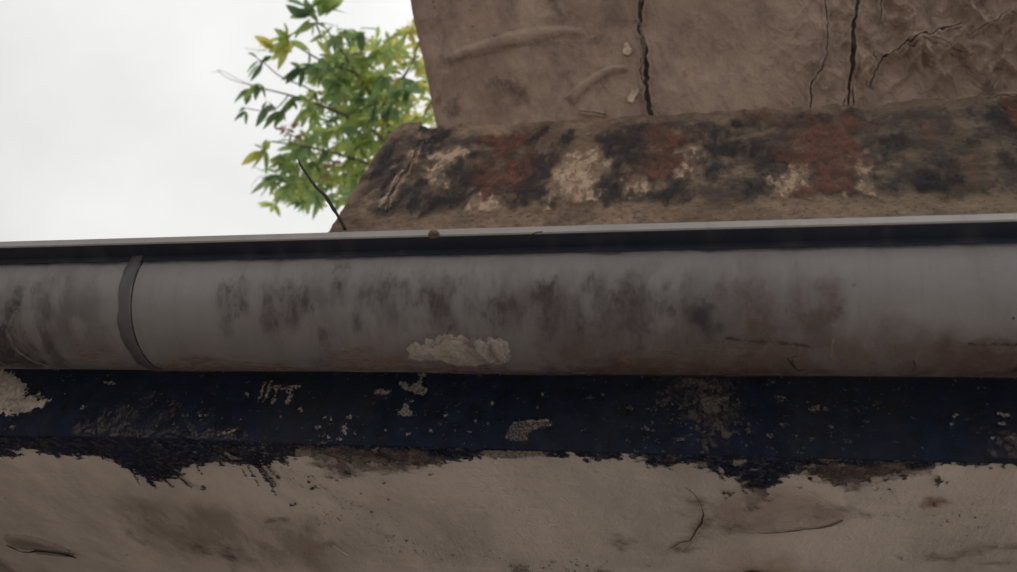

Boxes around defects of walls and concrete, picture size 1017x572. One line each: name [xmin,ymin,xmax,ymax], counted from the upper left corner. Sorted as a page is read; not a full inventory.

crack [634,0,656,116]
crack [806,0,968,108]
leakage [360,125,574,216]
leakage [594,101,1017,207]
peeling [0,369,52,428]
peeling [74,391,247,440]
peeling [245,380,302,412]
peeling [374,372,428,416]
peeling [480,419,552,459]
peeling [659,375,753,450]
peeling [991,412,1017,458]